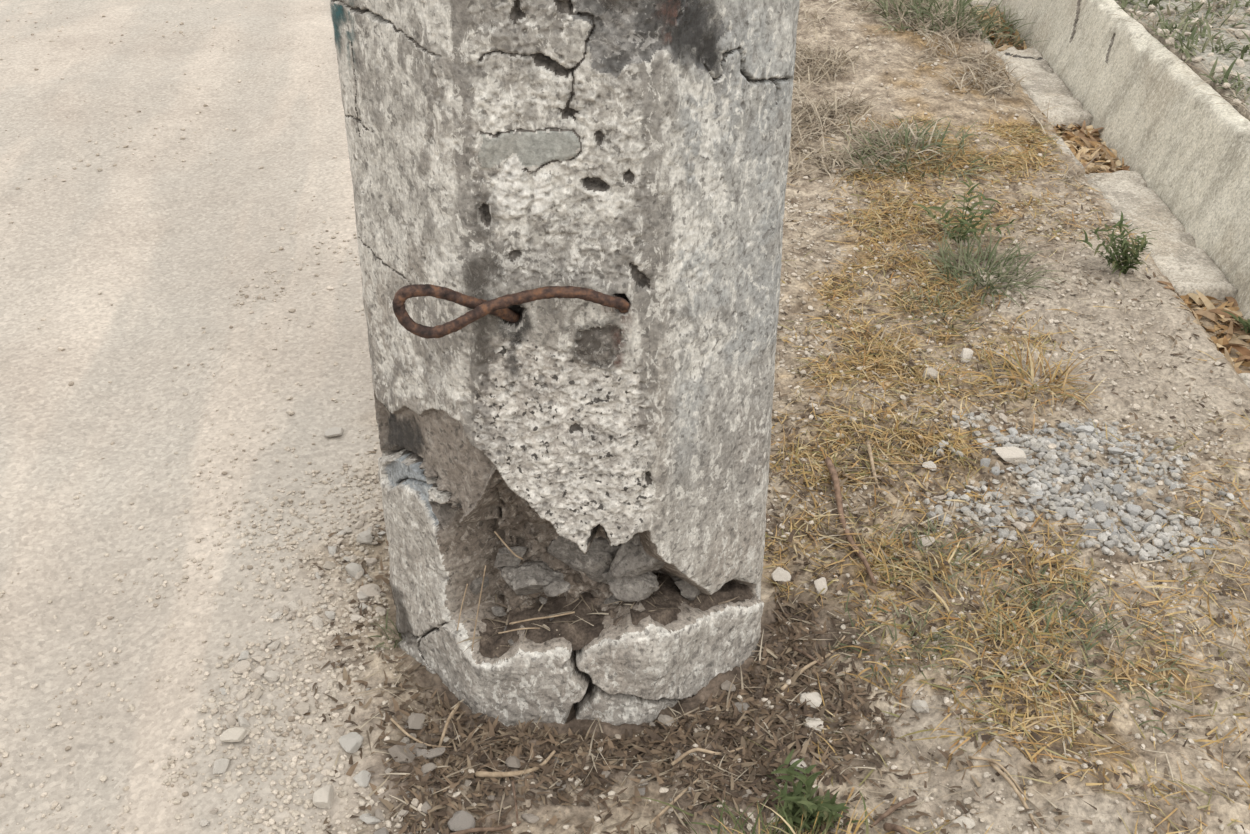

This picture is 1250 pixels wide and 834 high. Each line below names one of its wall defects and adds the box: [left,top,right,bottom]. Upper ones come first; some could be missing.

crack [1069,0,1082,43]
crack [331,0,436,137]
crack [479,0,595,172]
crack [703,47,788,105]
crack [1005,52,1043,60]
crack [358,237,411,285]
spalling [374,305,763,665]
crack [418,622,449,668]
crack [569,649,595,711]